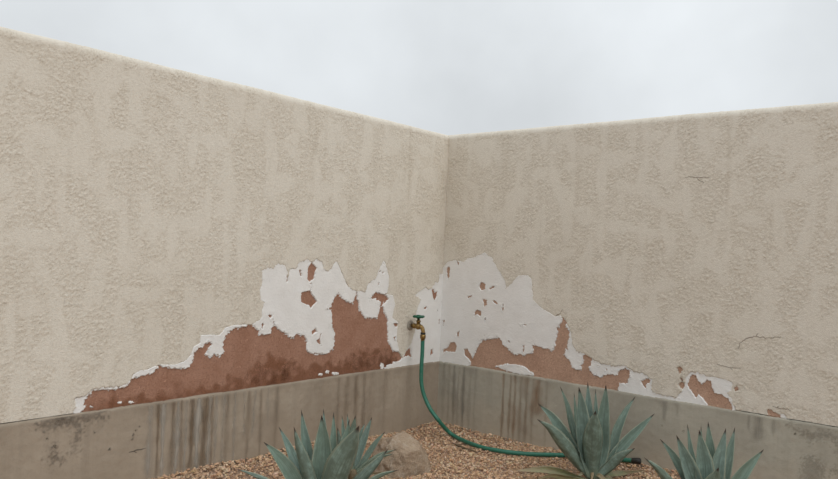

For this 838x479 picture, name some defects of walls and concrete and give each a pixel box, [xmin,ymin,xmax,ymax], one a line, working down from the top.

peeling [73,252,741,413]